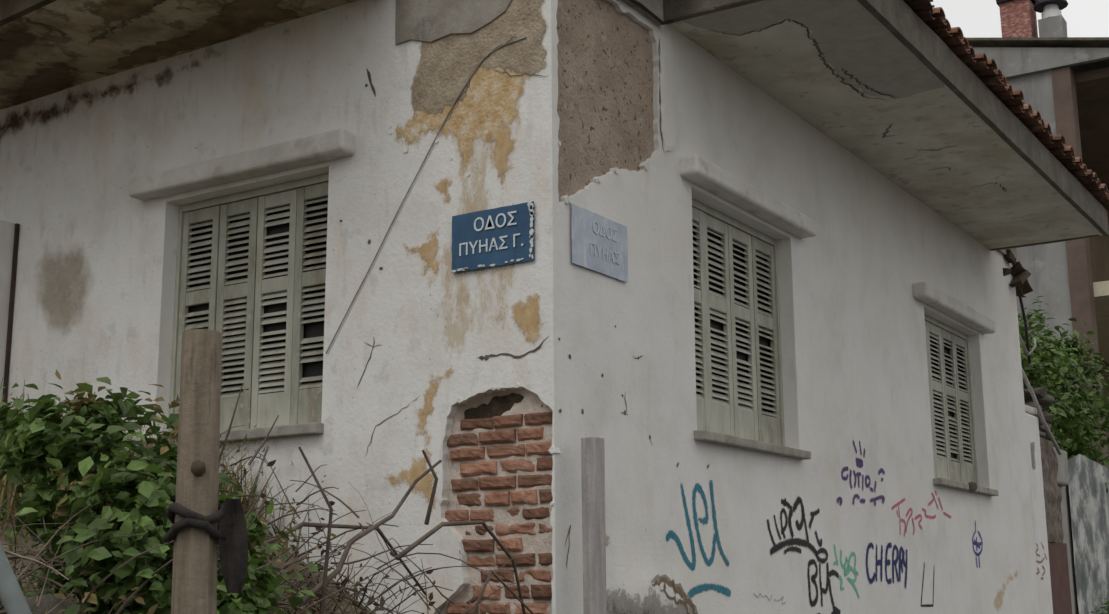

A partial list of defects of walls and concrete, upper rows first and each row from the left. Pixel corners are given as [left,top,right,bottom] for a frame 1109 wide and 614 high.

damp [6,59,78,108]
flaking render [389,0,679,205]
crack [712,19,895,138]
peeling [406,233,439,275]
peeling [513,294,540,343]
flaking render [389,368,562,614]
peeling [606,586,693,614]